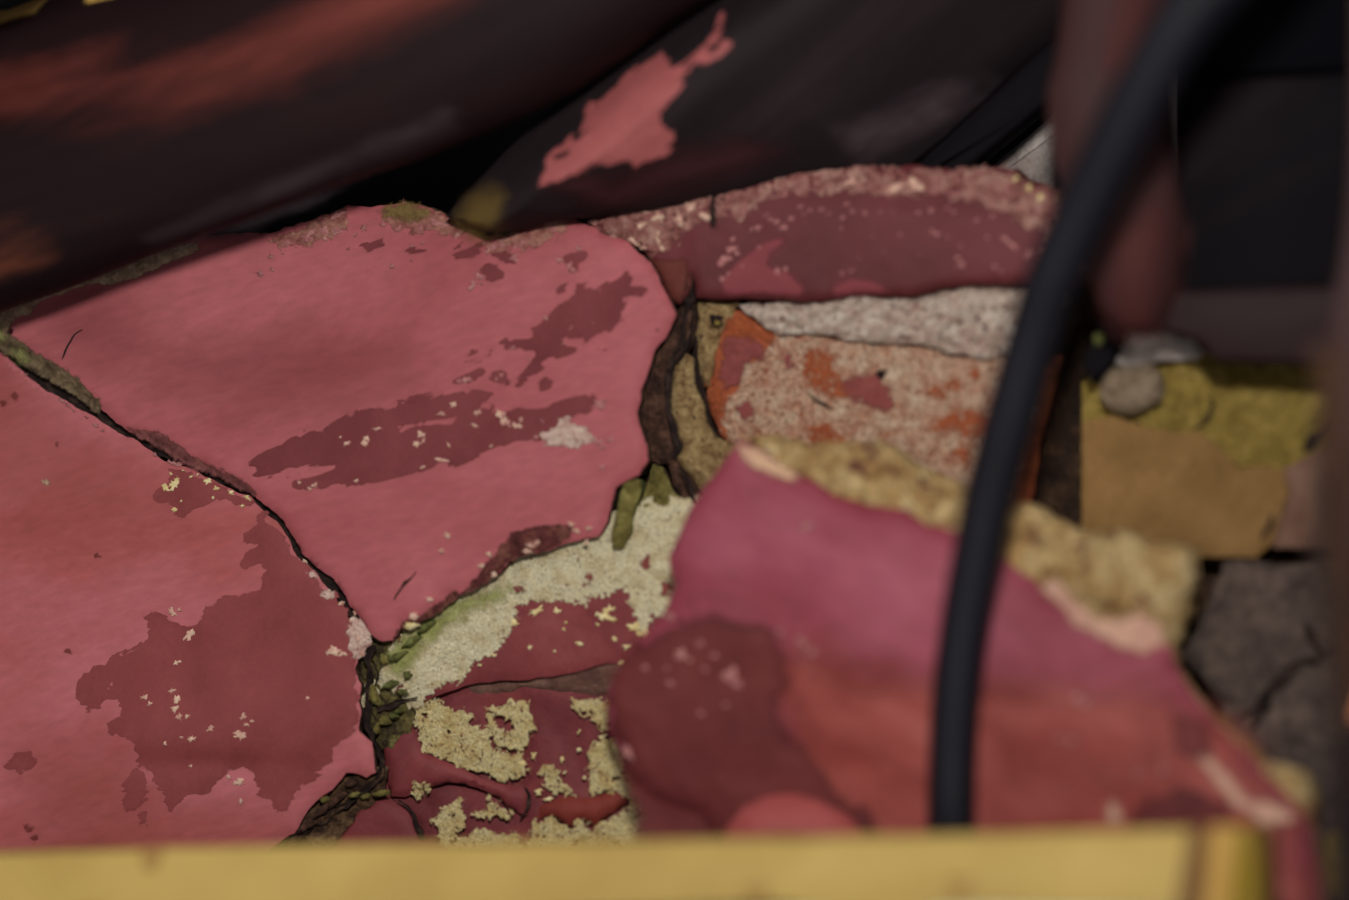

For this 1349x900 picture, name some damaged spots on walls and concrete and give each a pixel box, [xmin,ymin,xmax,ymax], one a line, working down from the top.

crack [0,330,437,845]
peeling [75,468,372,826]
spalling [393,522,593,639]
crack [520,787,531,819]
spalling [248,141,1060,531]
peeling [467,613,875,838]
crack [664,273,718,502]
spalling [1004,356,1202,653]